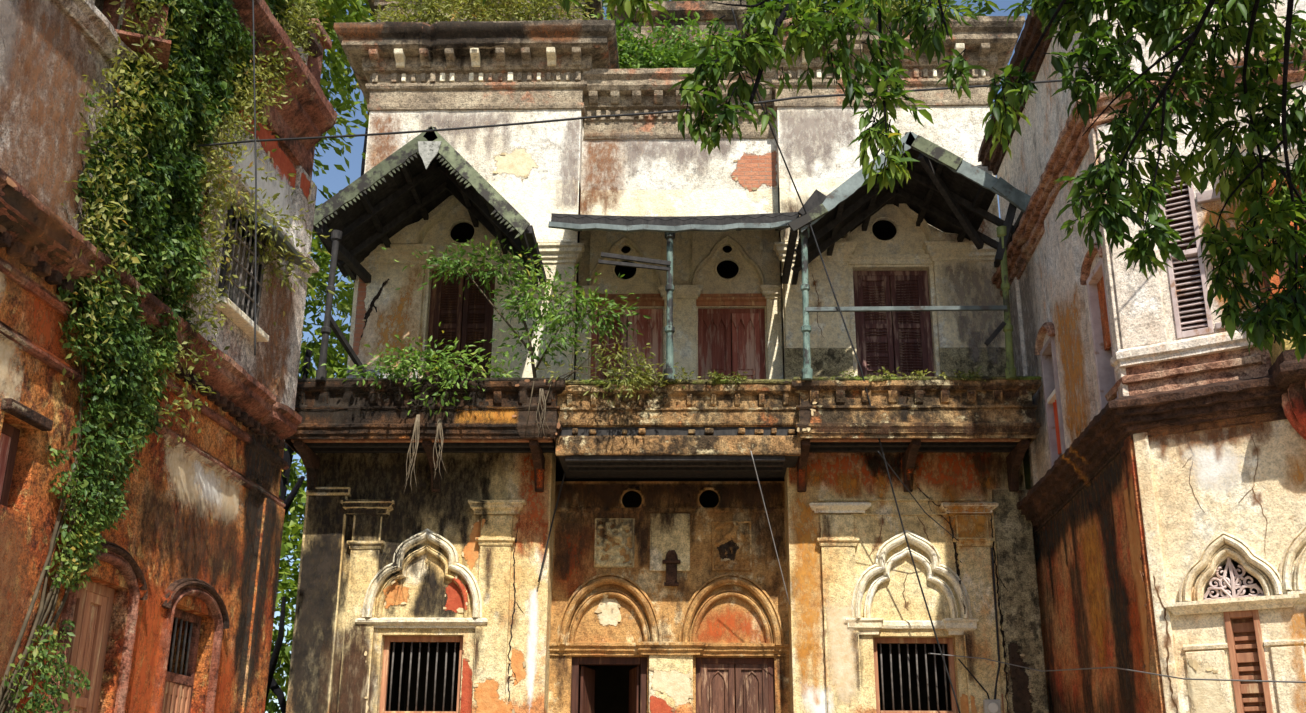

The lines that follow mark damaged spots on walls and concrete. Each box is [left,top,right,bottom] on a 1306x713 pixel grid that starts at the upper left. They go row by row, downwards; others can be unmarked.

flaking render [731,150,777,192]
crack [361,279,390,338]
leakage [142,271,507,713]
crack [1182,433,1205,513]
leakage [1143,415,1271,489]
crack [1240,433,1267,556]
peeling [383,580,409,609]
leakage [1032,443,1136,713]
peeling [649,667,693,713]